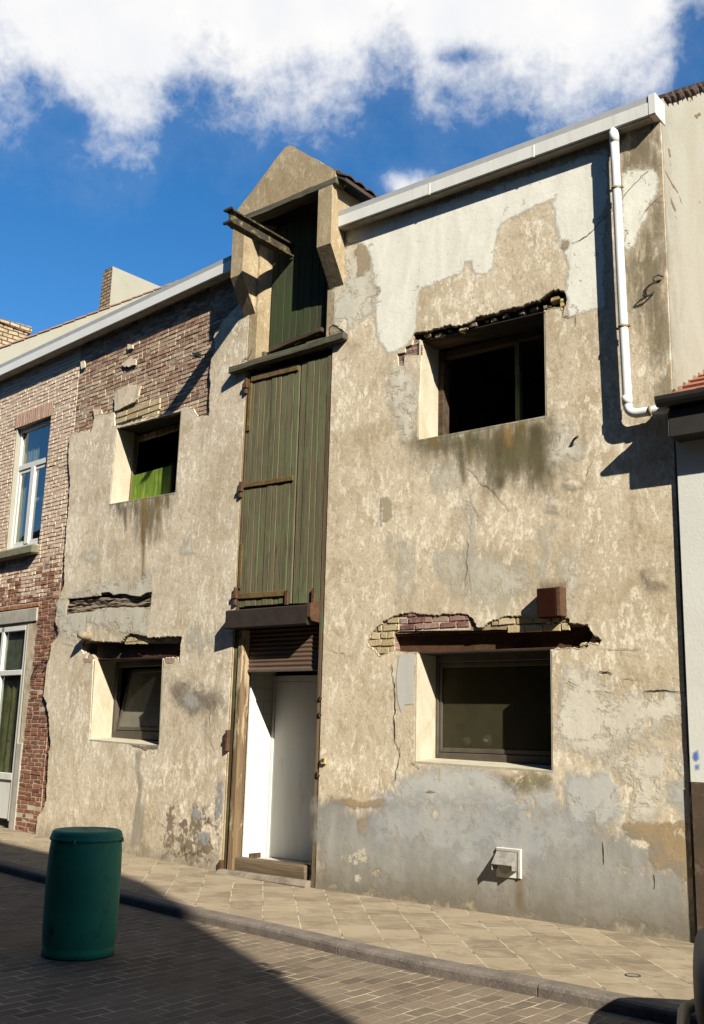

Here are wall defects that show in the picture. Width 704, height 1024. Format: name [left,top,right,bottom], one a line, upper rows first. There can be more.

peeling [329,146,609,441]
water stain [419,424,553,487]
peeling [36,327,220,829]
water stain [118,497,169,575]
flaking render [366,552,601,657]
crack [391,665,419,780]
peeling [164,782,223,864]
peeling [316,667,696,940]
water stain [506,773,549,791]